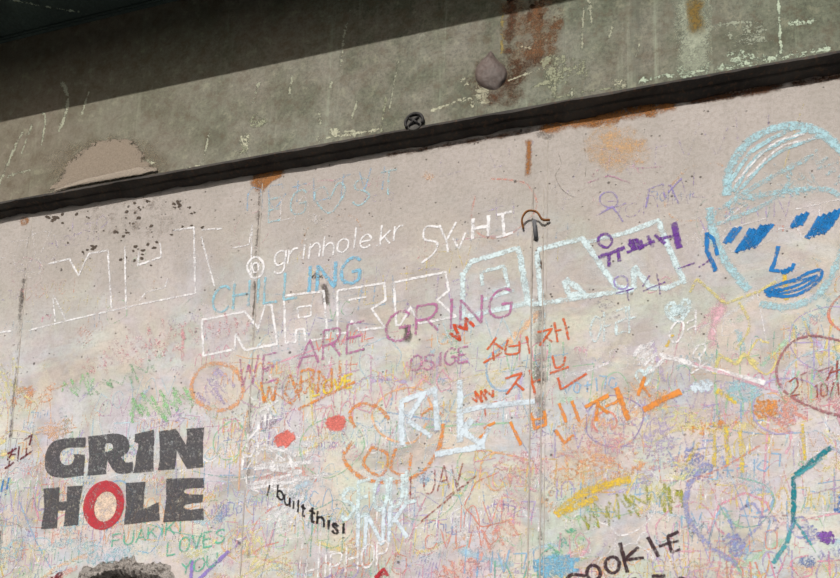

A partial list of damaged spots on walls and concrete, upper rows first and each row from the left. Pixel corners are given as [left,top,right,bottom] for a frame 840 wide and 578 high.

corrosion [500,0,557,85]
corrosion [689,73,840,104]
corrosion [539,103,676,163]